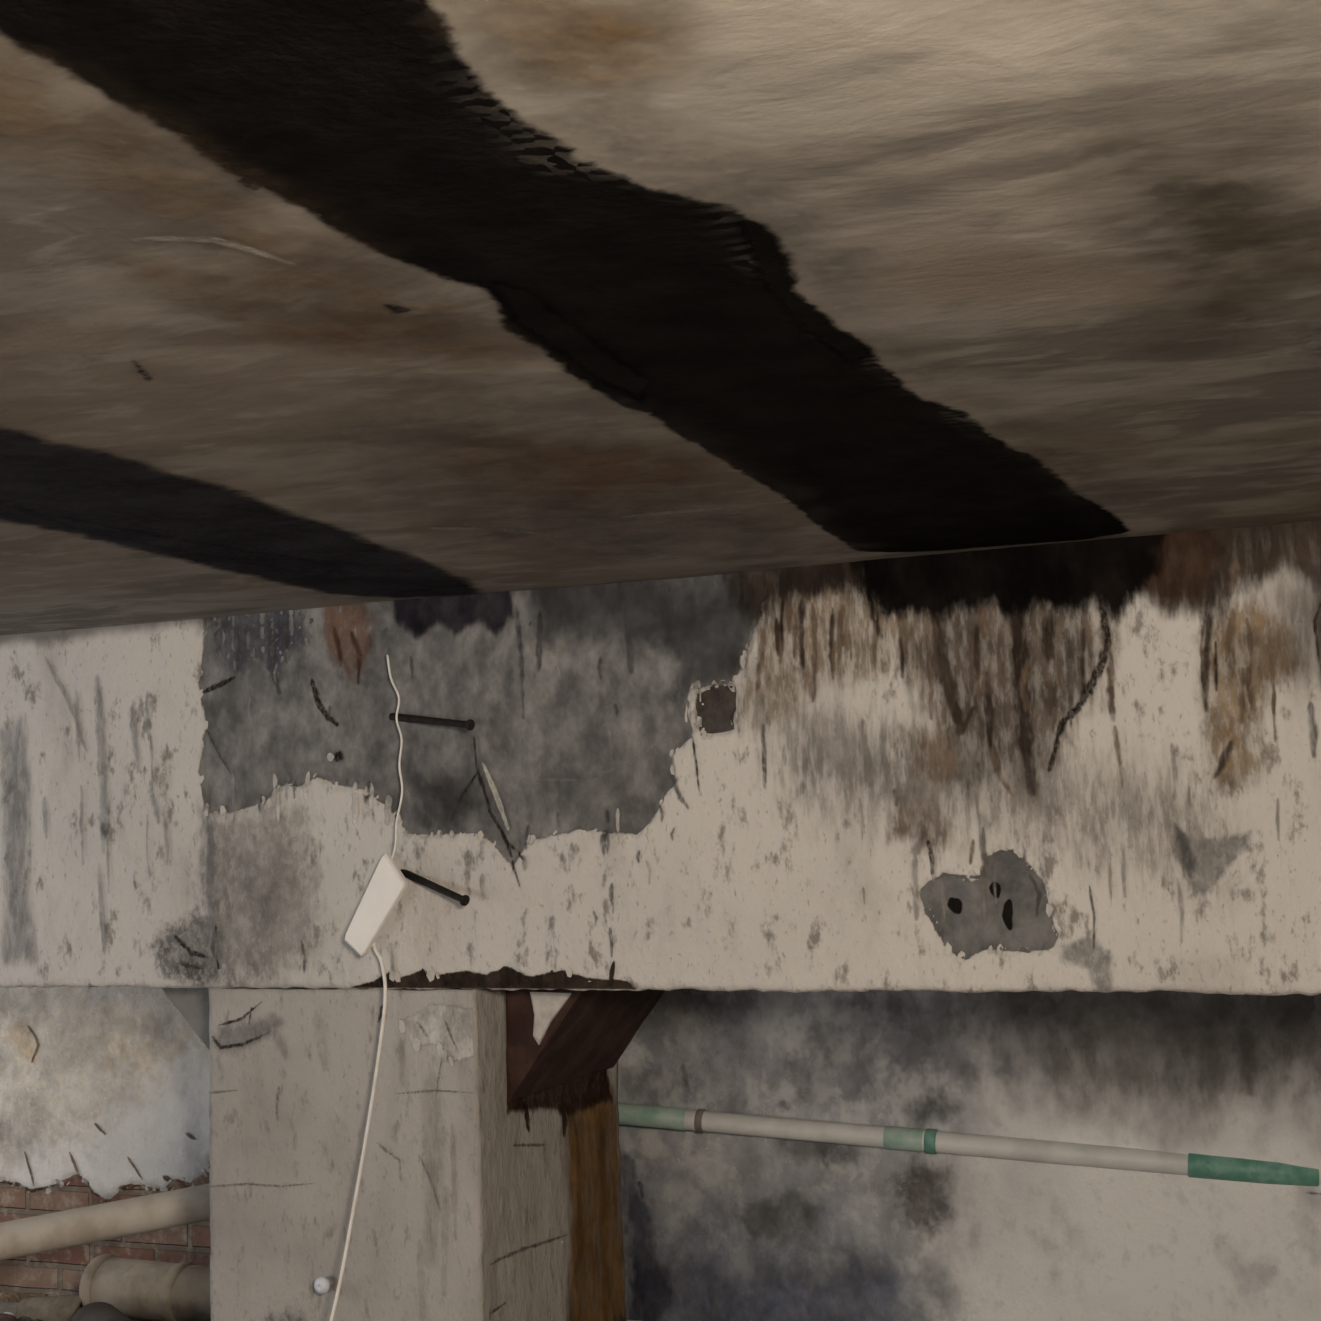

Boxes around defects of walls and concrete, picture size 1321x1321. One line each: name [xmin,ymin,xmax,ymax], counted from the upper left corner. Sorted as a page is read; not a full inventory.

leakage [0,0,1163,638]
peeling [198,571,765,864]
leakage [804,726,1201,903]
peeling [920,842,1110,992]
leakage [618,990,964,1129]
peeling [0,1160,210,1223]
peeling [0,1220,211,1296]
leakage [621,1128,950,1321]